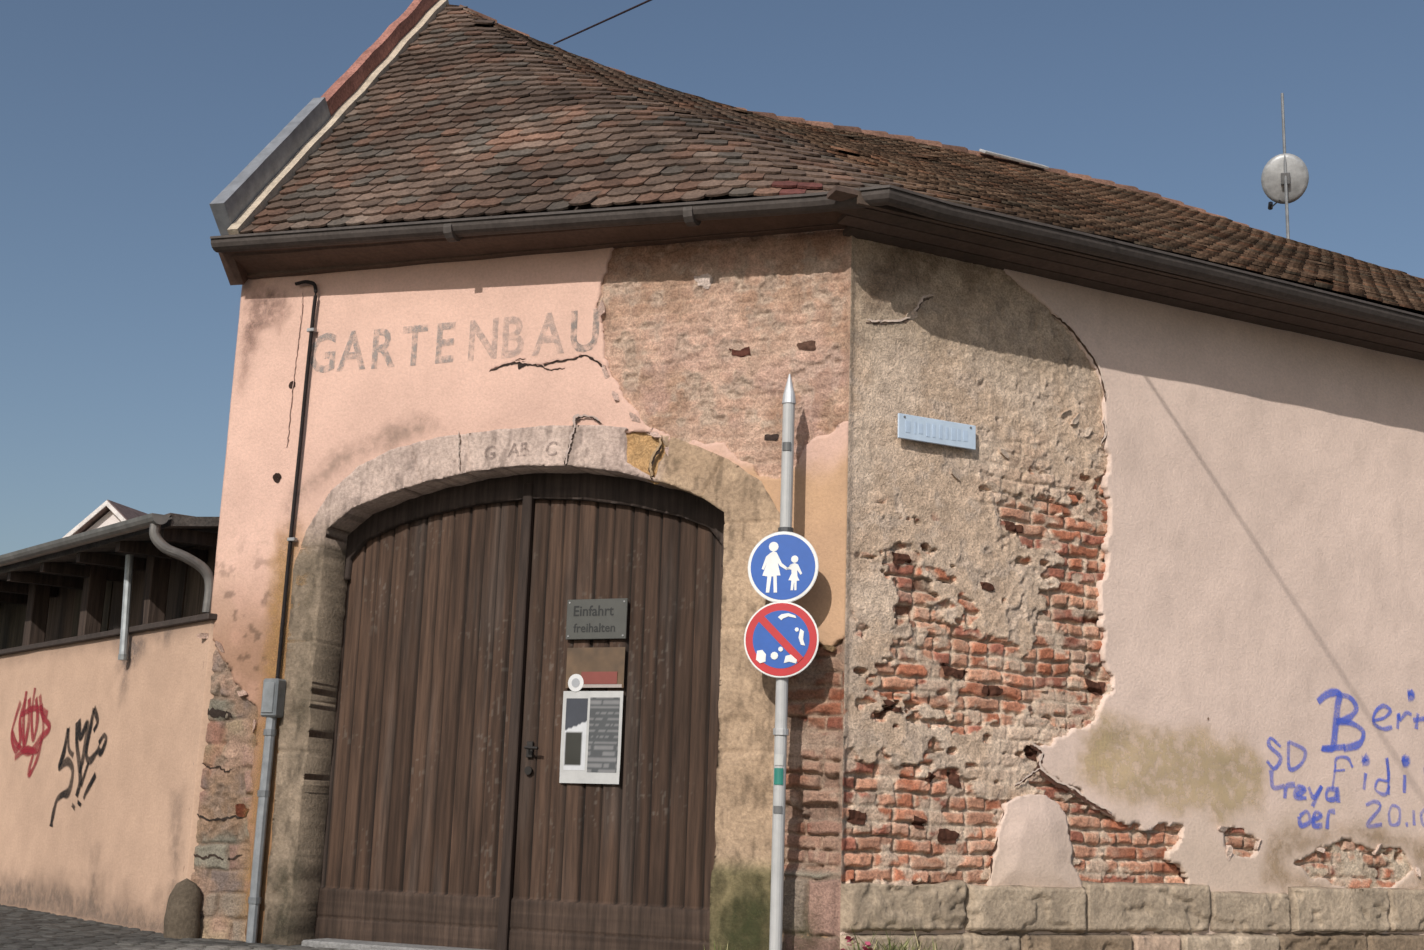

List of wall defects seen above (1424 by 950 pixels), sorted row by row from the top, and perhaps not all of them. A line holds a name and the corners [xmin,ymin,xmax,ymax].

crack [866,294,932,325]
crack [489,353,603,372]
flaking render [597,229,1185,950]
flaking render [183,633,258,942]
water stain [1085,719,1262,818]
flaking render [1217,826,1262,861]
flaking render [1294,839,1421,889]